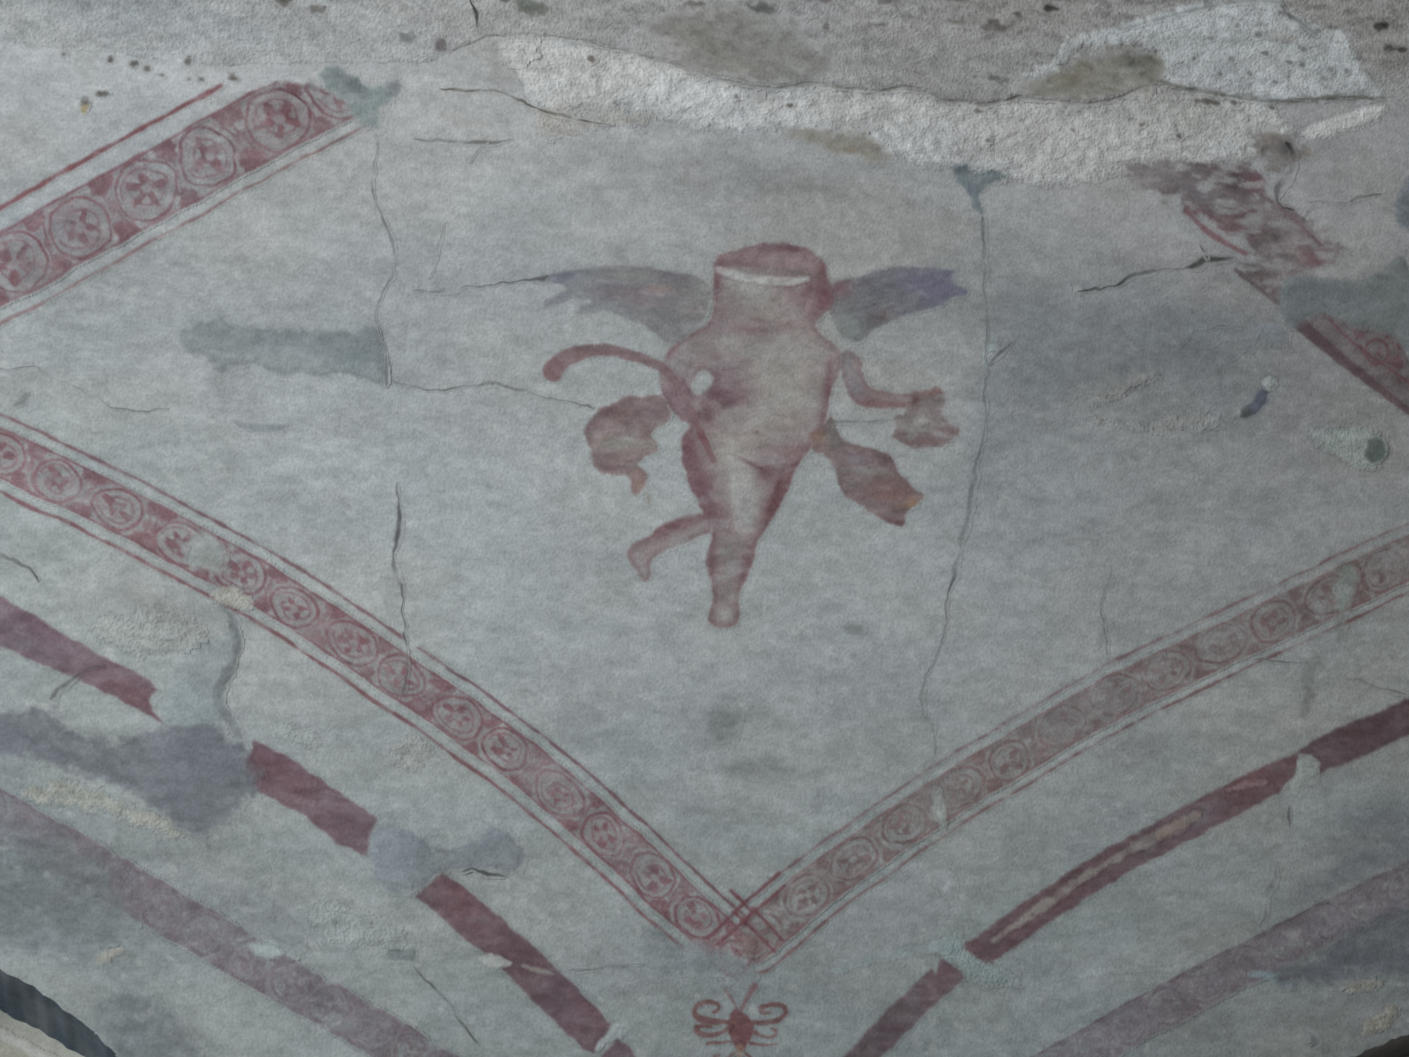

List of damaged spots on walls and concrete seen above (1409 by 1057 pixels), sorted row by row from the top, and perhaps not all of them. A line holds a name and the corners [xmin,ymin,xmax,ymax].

crack [468,0,482,27]
spalling [486,0,1409,190]
crack [1077,244,1236,294]
crack [916,217,1016,755]
crack [388,482,411,695]